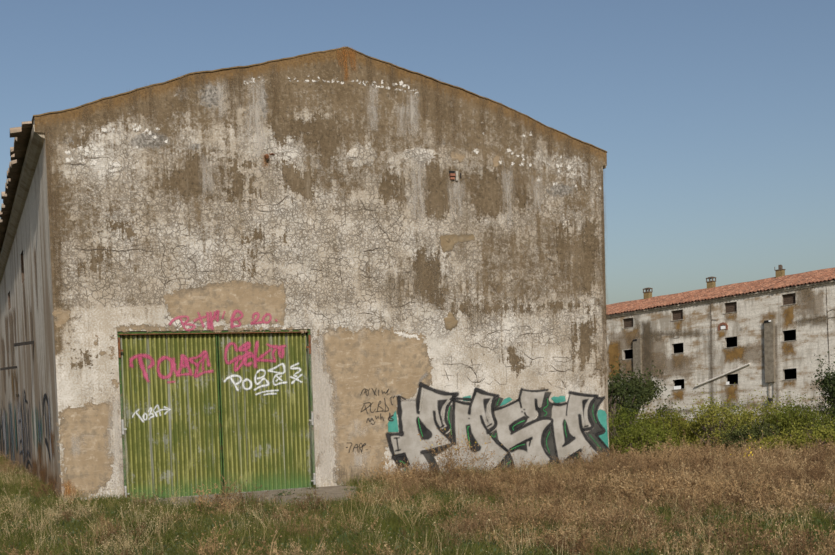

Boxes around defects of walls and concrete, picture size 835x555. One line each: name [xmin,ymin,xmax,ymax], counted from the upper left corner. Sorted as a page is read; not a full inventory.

crack [73,240,224,291]
crack [255,195,414,315]
spalling [55,213,307,501]
spalling [312,323,434,485]
crack [444,326,605,390]
water stain [635,319,699,384]
water stain [710,331,723,407]
water stain [796,316,827,325]